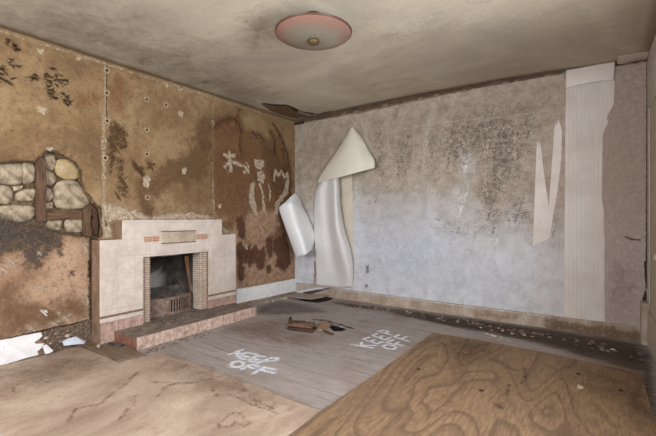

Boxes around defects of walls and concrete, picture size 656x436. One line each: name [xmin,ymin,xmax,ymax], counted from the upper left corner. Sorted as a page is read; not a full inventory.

flaking render [74,54,289,122]
spalling [0,147,212,252]
leakage [107,106,294,288]
leakage [334,65,652,393]